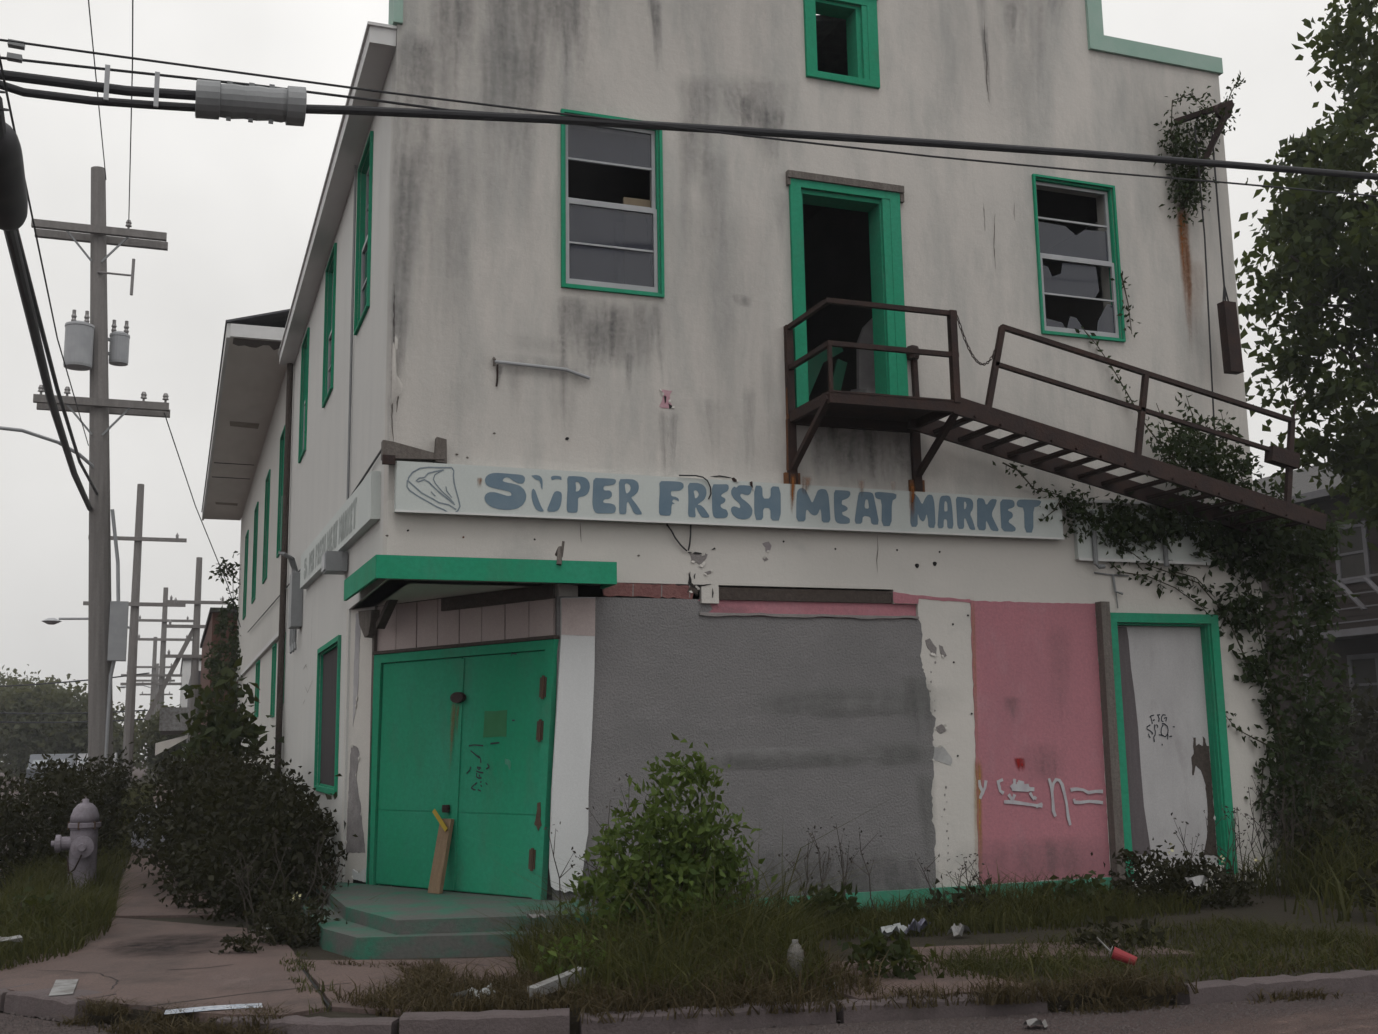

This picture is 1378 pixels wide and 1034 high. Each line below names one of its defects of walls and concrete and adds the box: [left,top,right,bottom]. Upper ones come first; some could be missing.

rust [1178,209,1189,284]